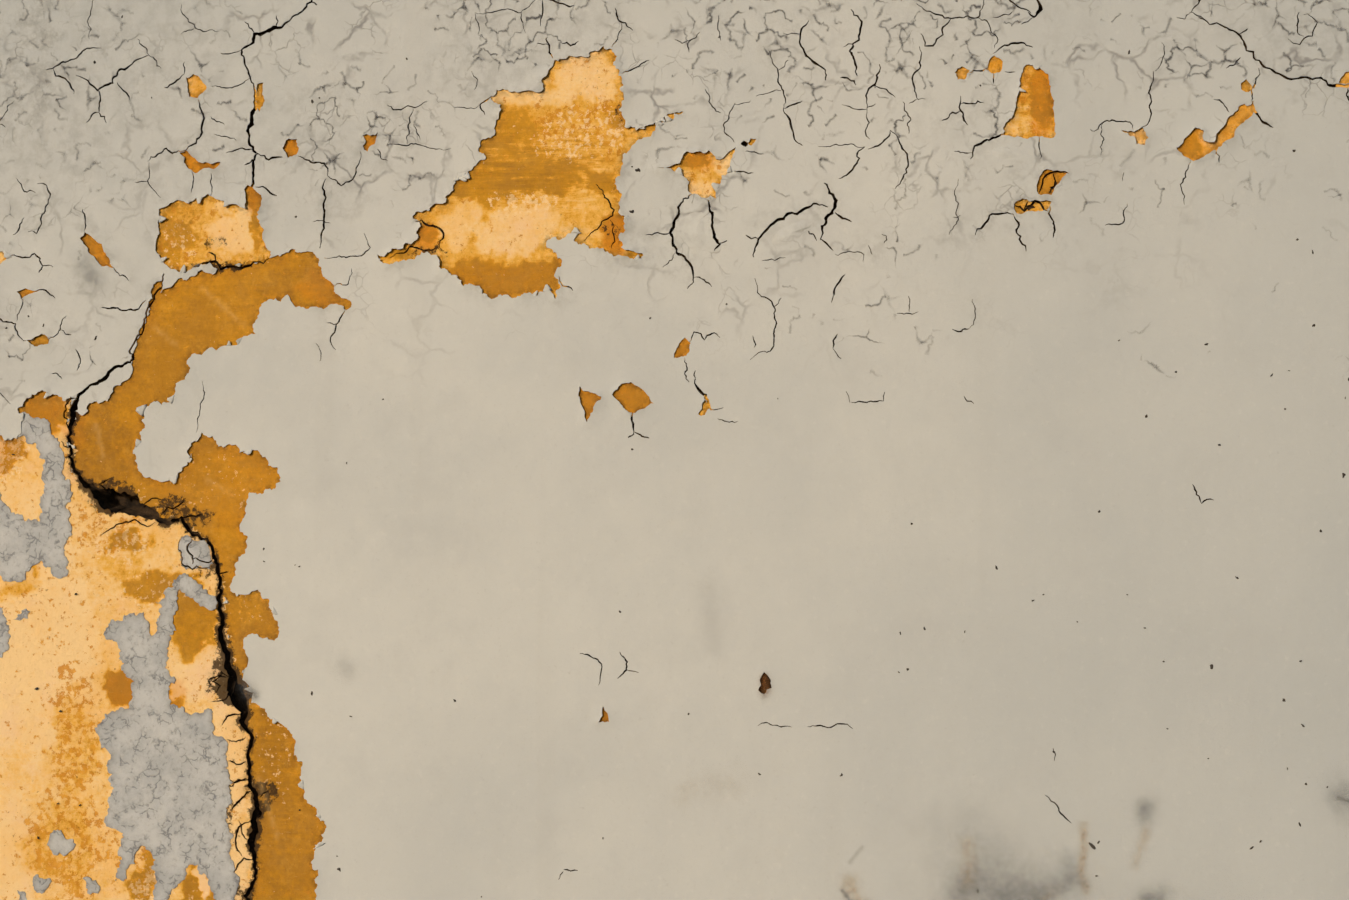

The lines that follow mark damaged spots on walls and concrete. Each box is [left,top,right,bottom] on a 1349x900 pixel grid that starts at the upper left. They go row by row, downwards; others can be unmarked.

crack [26,0,579,351]
peeling [378,42,683,299]
crack [585,184,615,248]
peeling [668,139,756,201]
crack [647,0,1067,360]
peeling [1001,63,1056,142]
peeling [1176,80,1257,164]
crack [1086,0,1349,225]
peeling [578,382,652,421]
crack [684,332,736,423]
crack [0,179,268,900]
peeling [0,182,352,900]